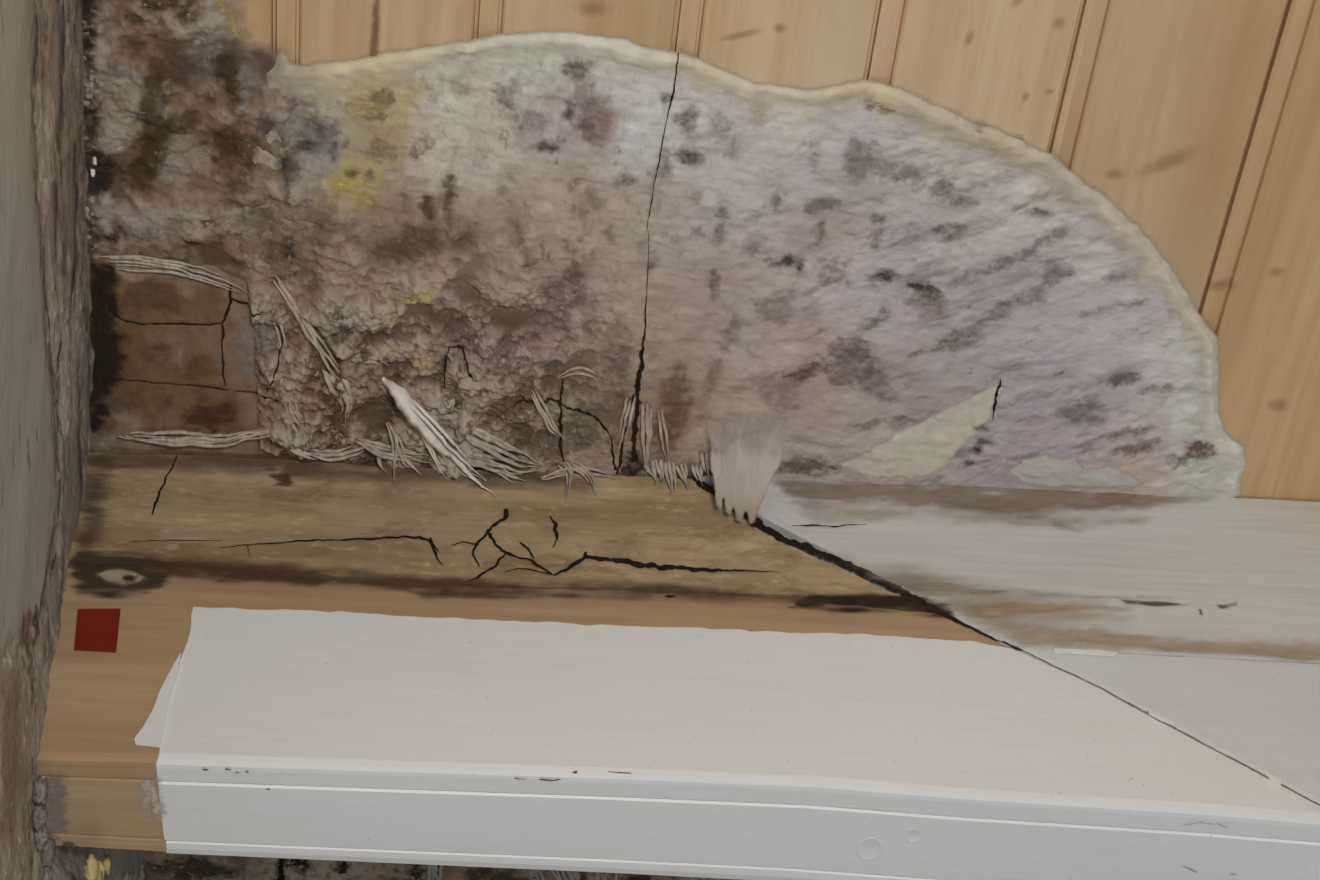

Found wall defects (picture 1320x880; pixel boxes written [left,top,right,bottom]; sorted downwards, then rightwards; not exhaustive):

crack [513,53,679,474]
damp [71,0,1246,598]
crack [148,455,775,598]
damp [796,571,1320,660]
crack [277,858,285,880]
damp [141,850,740,880]